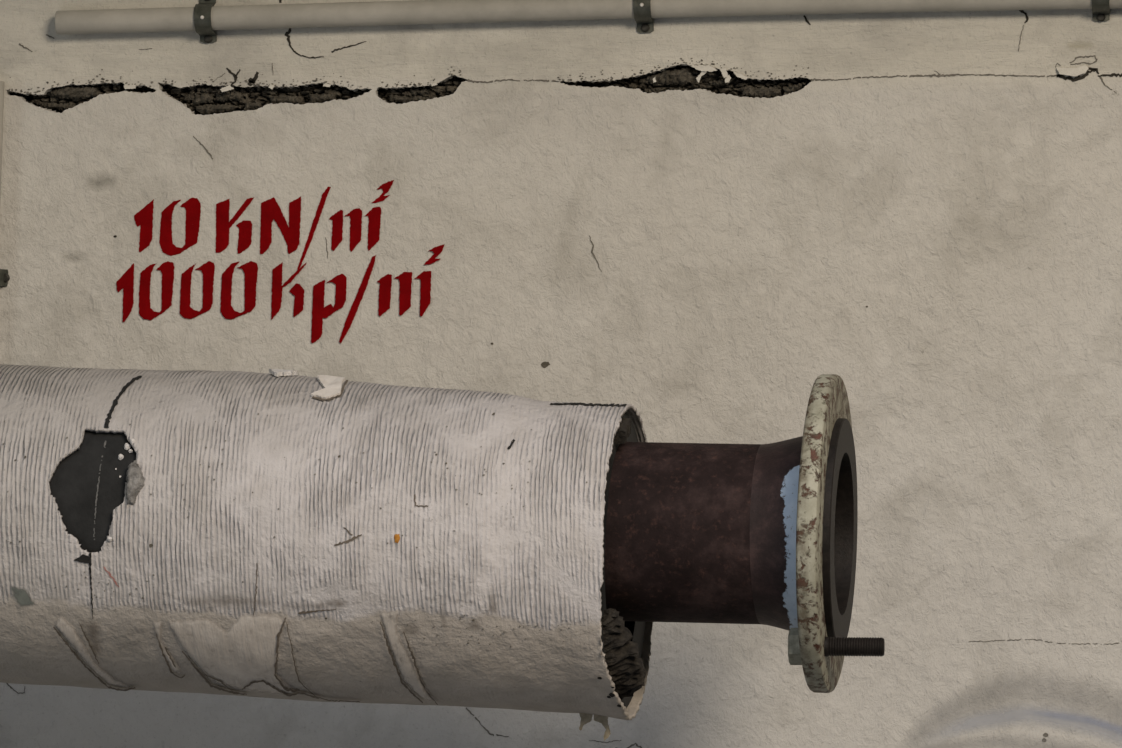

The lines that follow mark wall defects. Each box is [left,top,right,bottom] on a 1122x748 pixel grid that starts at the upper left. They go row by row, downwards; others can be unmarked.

crack [214,0,367,86]
spalling [9,67,467,115]
crack [467,77,555,85]
spalling [557,58,811,98]
crack [1098,73,1122,93]
crack [969,638,1118,646]
crack [589,740,642,748]